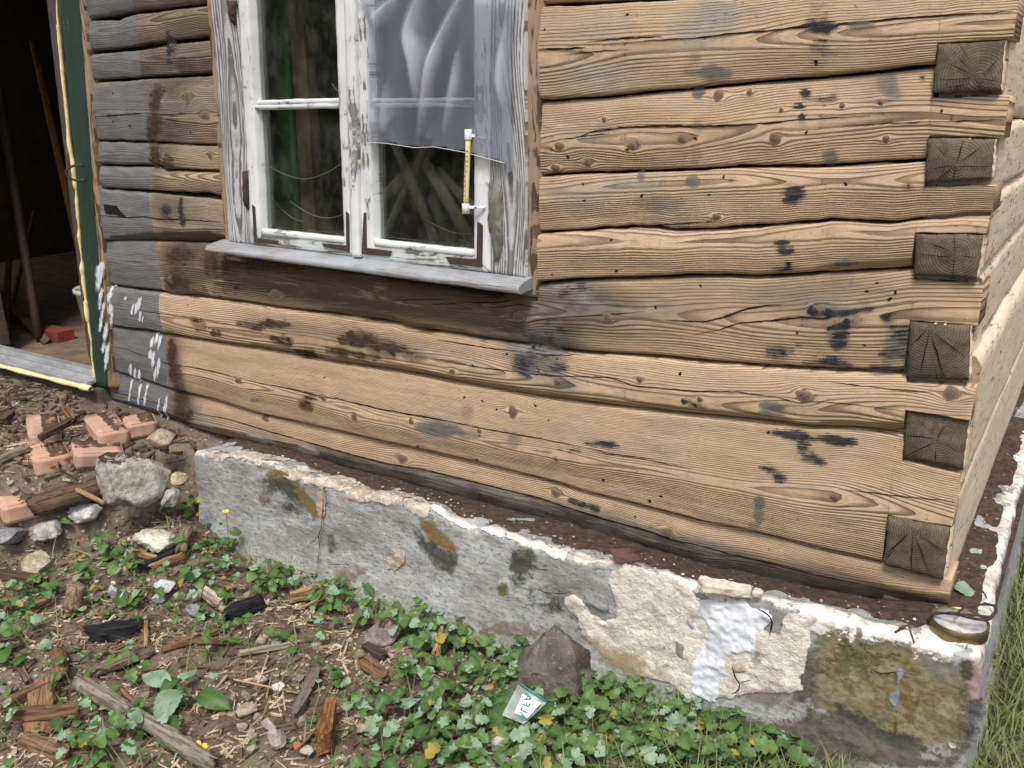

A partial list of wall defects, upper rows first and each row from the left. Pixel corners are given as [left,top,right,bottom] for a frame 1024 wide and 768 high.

crack [384,298,642,323]
crack [670,304,825,334]
leakage [205,434,568,613]
crack [116,392,899,594]
flaking render [564,563,817,702]
leakage [735,603,985,768]